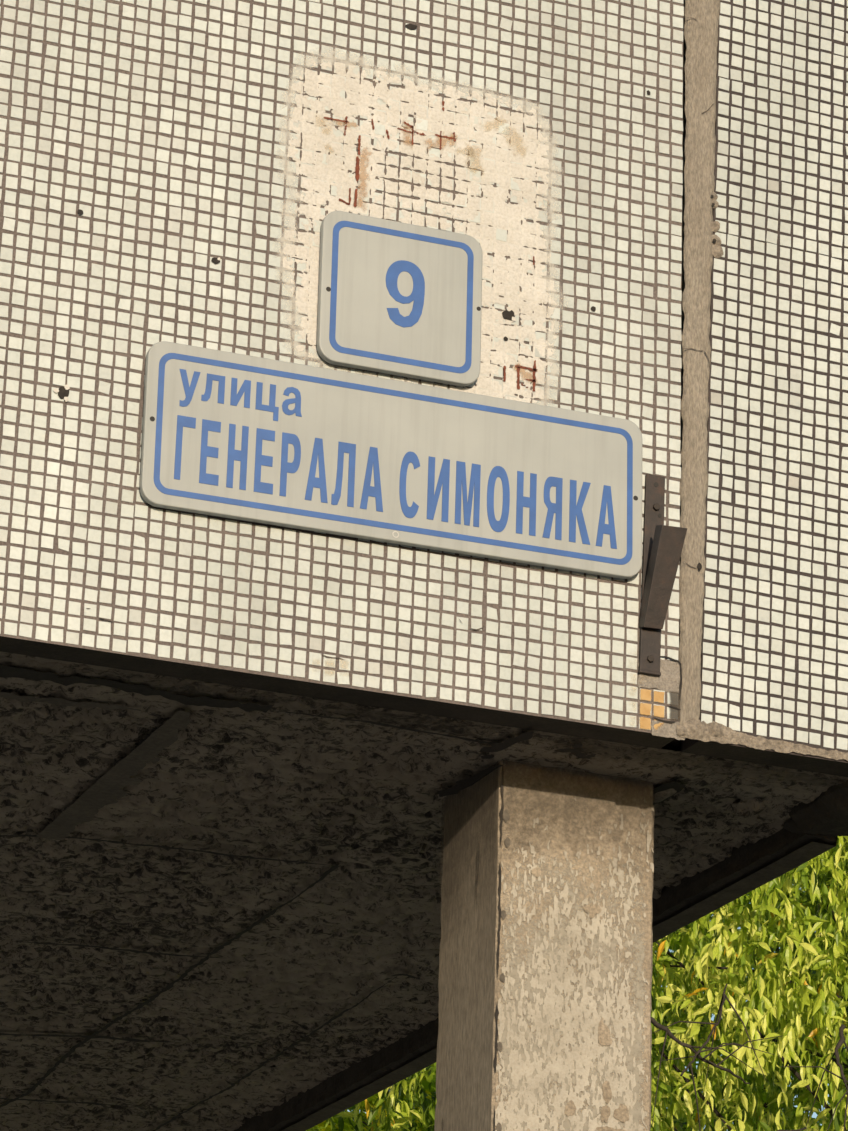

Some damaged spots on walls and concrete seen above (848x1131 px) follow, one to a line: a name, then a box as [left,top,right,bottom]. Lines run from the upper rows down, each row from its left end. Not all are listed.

corrosion [324,116,456,207]
peeling [277,51,561,405]
corrosion [503,360,537,392]
peeling [637,656,848,761]